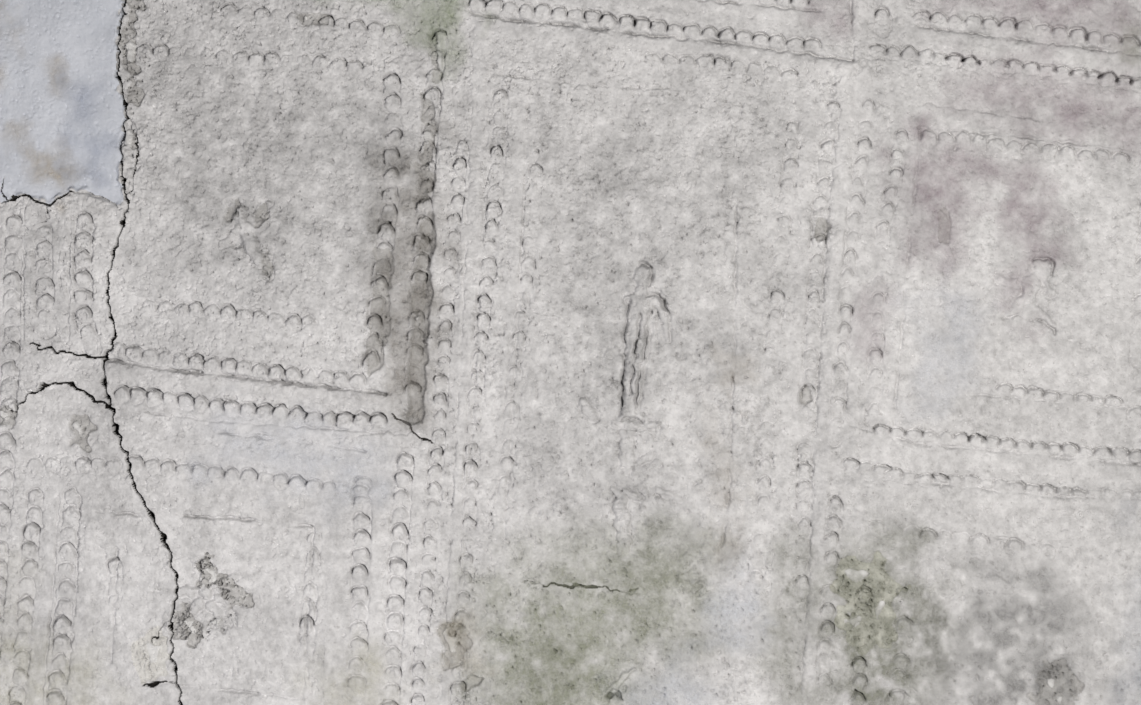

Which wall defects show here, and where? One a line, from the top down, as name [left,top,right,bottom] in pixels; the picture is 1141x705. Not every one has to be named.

crack [1,181,75,214]
crack [18,1,183,705]